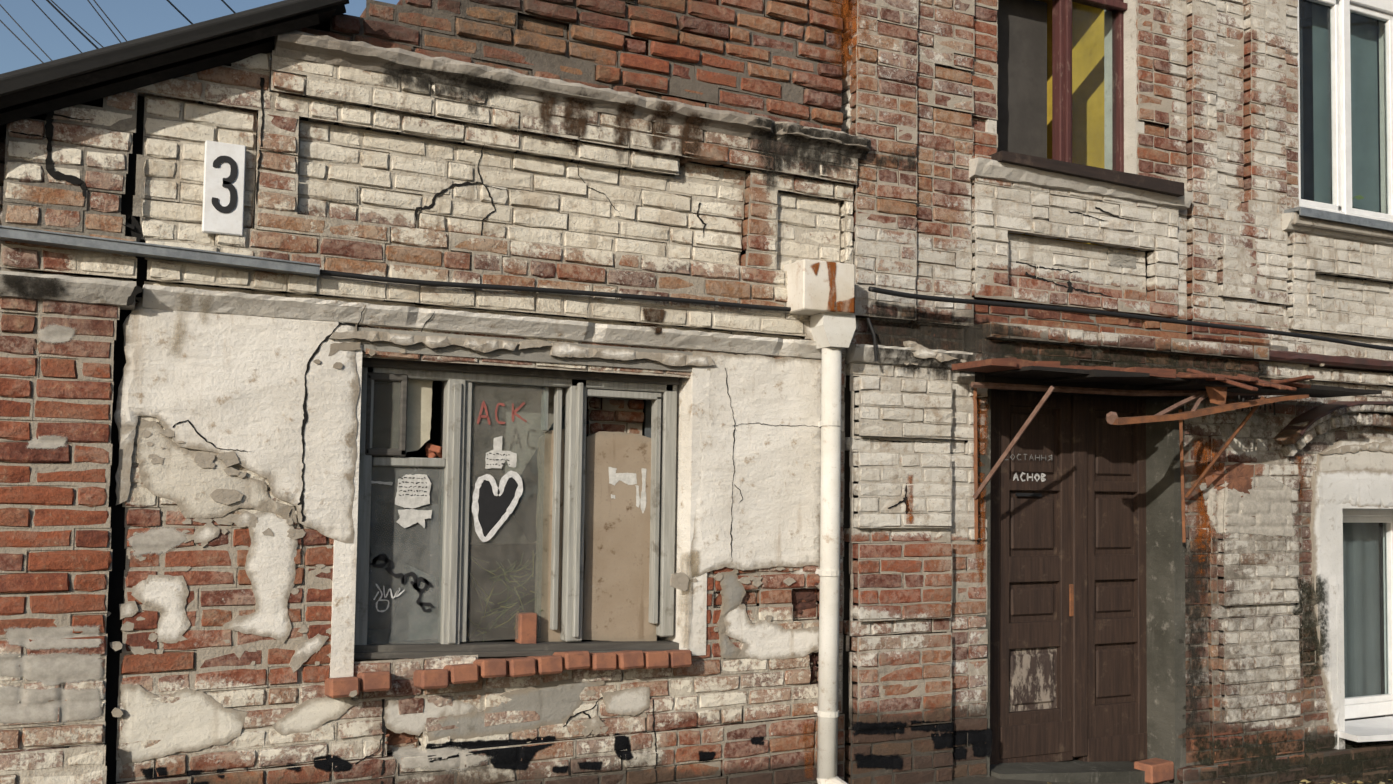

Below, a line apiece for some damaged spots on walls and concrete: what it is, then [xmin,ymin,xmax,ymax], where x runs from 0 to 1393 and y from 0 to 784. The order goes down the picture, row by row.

rust [832,0,868,75]
water stain [384,64,513,111]
crack [10,111,90,197]
crack [415,144,525,241]
water stain [752,117,916,189]
crack [104,95,149,784]
crack [289,305,379,555]
peeling [1199,461,1295,537]
peeling [0,429,333,764]
peeling [670,567,820,684]
water stain [1183,538,1393,784]
peeling [263,678,650,772]